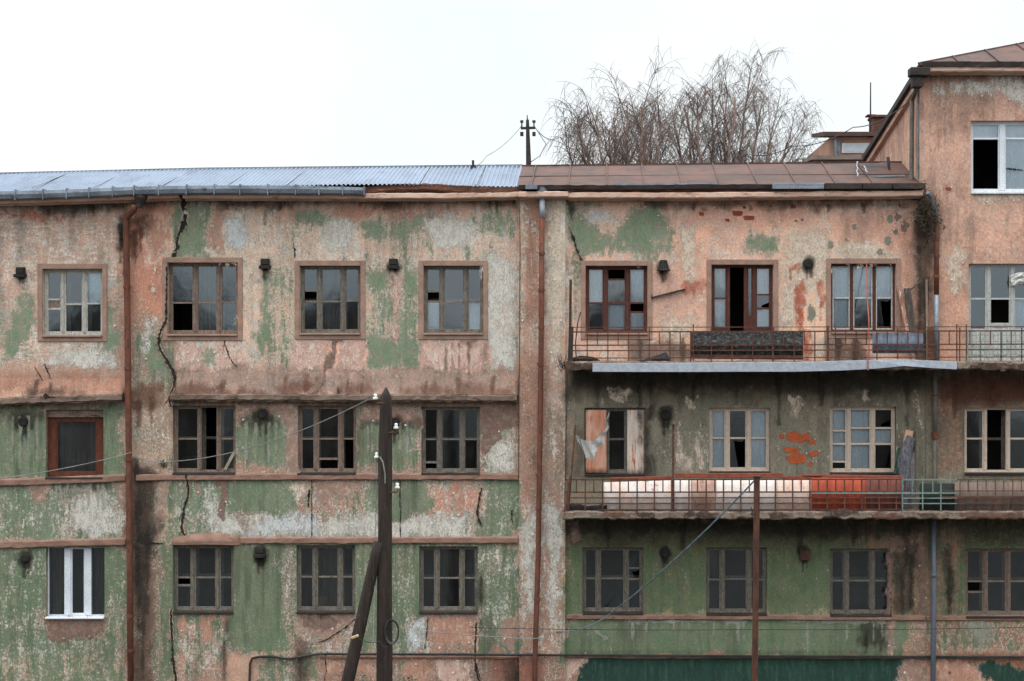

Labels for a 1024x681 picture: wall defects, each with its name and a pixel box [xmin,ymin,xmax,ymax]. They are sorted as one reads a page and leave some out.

crack [568,227,583,261]
spalling [725,206,755,222]
crack [154,197,189,407]
corrosion [789,263,826,361]
damp [573,338,924,422]
peeling [479,406,519,468]
spalling [779,431,820,467]
crack [145,475,191,545]
crack [475,488,483,526]
damp [55,461,160,633]